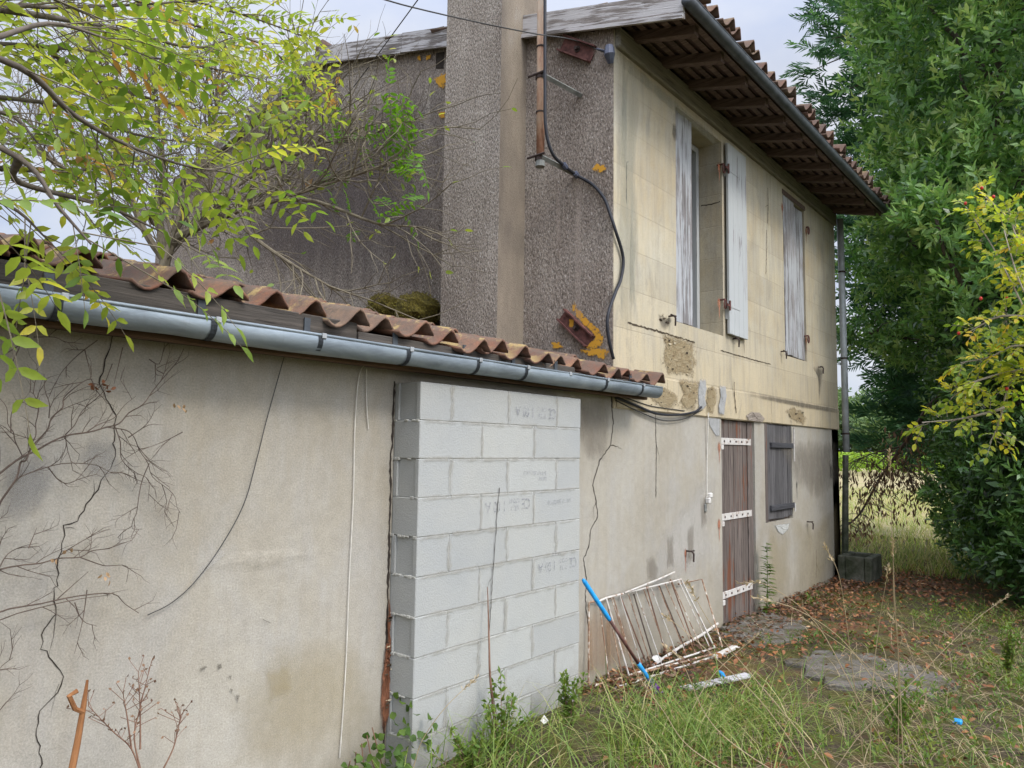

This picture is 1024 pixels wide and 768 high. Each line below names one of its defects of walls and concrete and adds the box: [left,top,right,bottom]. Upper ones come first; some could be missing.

crack [35,336,117,768]
crack [583,397,619,623]
spalling [651,314,717,413]
spalling [787,408,805,424]